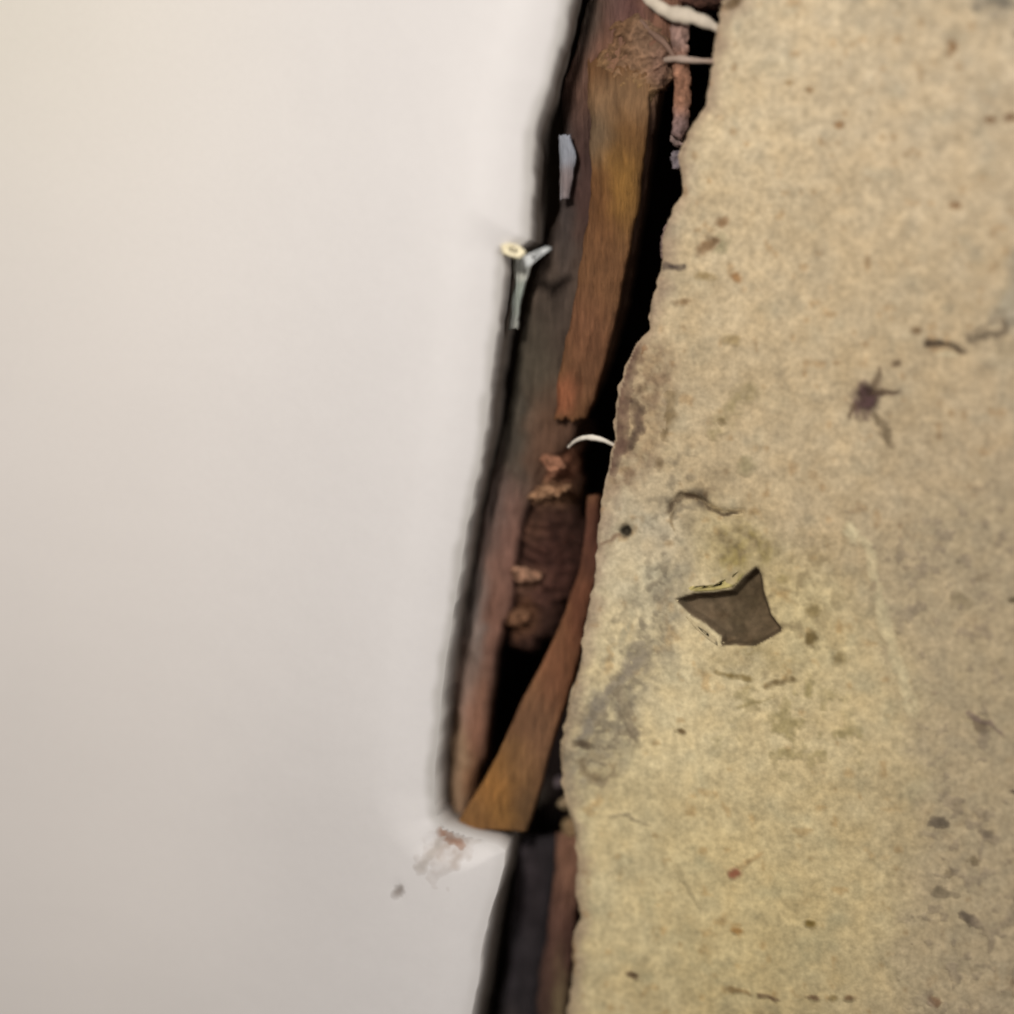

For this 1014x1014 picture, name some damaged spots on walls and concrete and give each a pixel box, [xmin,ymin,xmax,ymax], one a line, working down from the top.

peeling [501,243,551,269]
spalling [662,215,745,285]
spalling [603,333,684,503]
crack [666,455,744,533]
spalling [568,697,651,789]
peeling [673,450,1014,1014]
crack [607,811,651,827]
crack [673,861,707,911]
spalling [624,968,641,982]